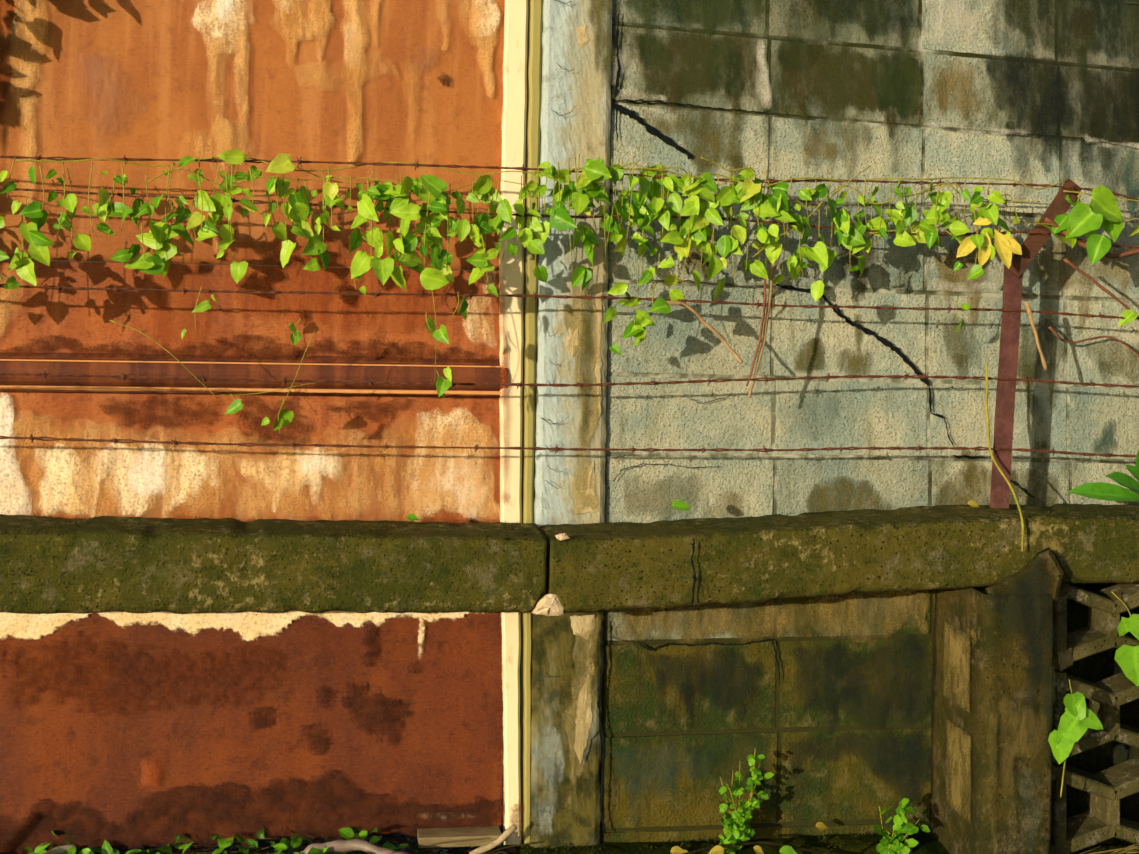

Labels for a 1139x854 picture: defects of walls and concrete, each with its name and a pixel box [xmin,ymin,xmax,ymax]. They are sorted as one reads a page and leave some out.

rust [495,0,505,196]
crack [611,12,767,159]
water stain [624,0,921,177]
water stain [986,0,1139,216]
rust [100,393,220,429]
rust [0,239,508,402]
rust [237,395,309,450]
crack [631,277,987,459]
crack [1010,480,1035,499]
peeling [0,610,469,653]
rust [0,613,523,854]
water stain [792,640,931,802]